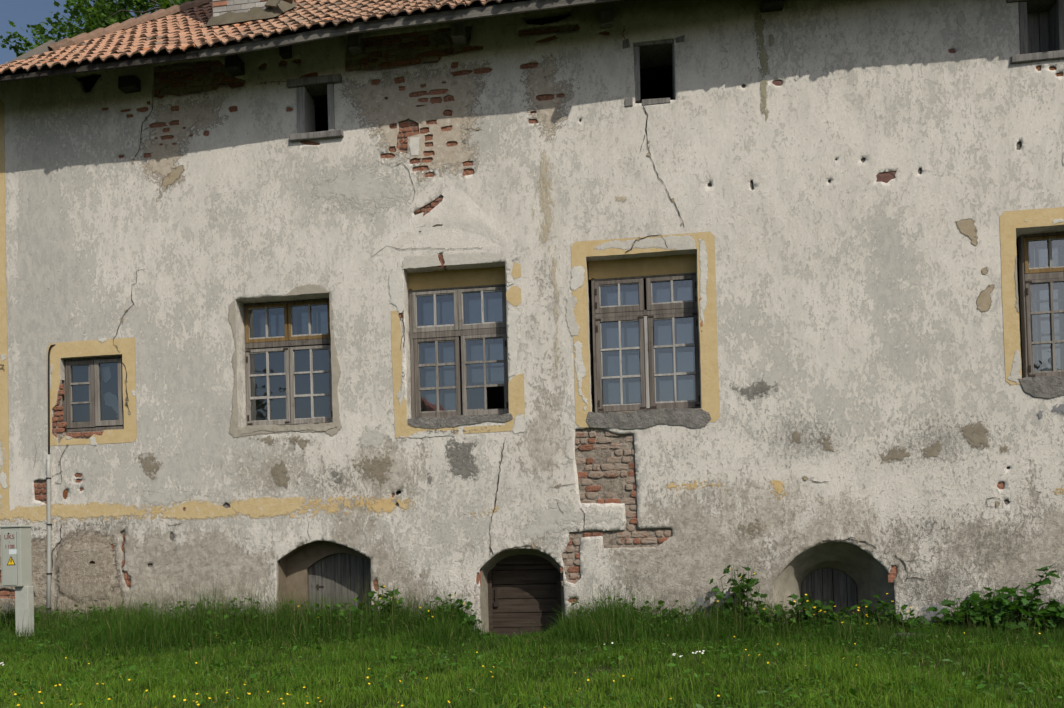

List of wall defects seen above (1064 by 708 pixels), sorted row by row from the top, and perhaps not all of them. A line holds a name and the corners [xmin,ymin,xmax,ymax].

crack [131,85,153,163]
spalling [102,60,246,205]
spalling [306,26,493,217]
spalling [520,54,581,143]
crack [625,106,684,253]
flaking render [47,364,104,446]
crack [113,269,142,415]
peeling [565,266,588,410]
flaking render [34,480,47,504]
spalling [31,528,131,617]
crack [489,438,541,554]
flaking render [519,428,673,586]